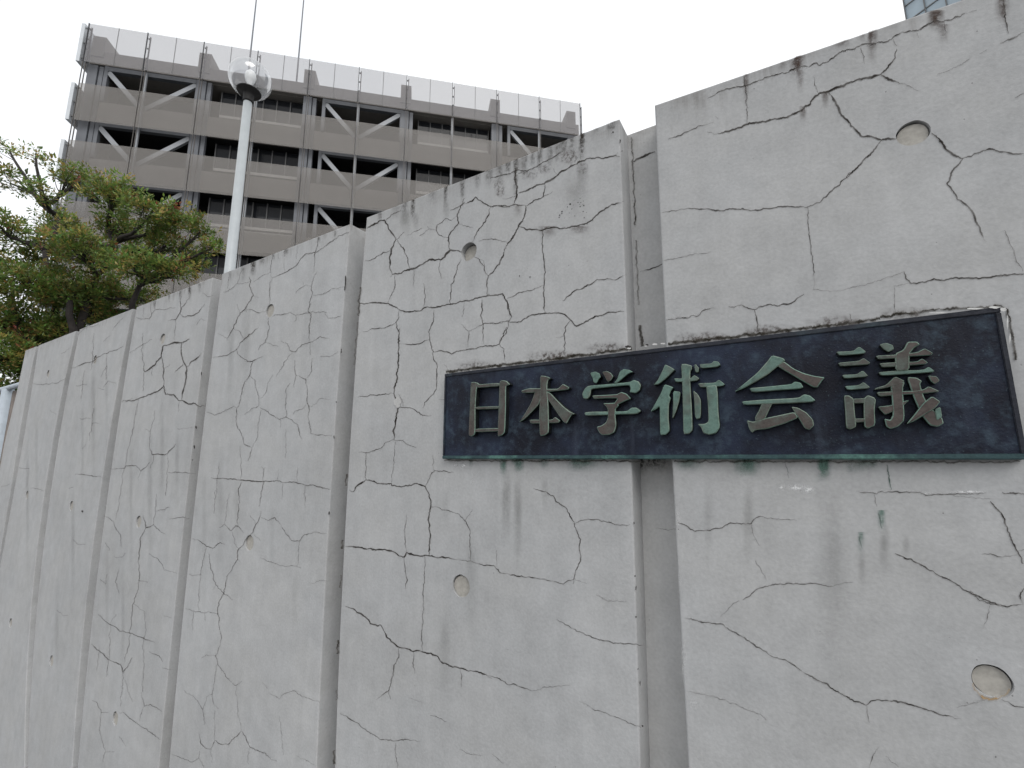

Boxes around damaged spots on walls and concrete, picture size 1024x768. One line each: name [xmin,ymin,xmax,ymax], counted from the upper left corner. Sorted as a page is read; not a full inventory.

crack [665,6,1024,332]
crack [78,151,653,749]
crack [659,516,790,533]
leakage [819,459,828,474]
crack [859,466,1024,564]
crack [895,553,1024,623]
crack [692,563,978,720]